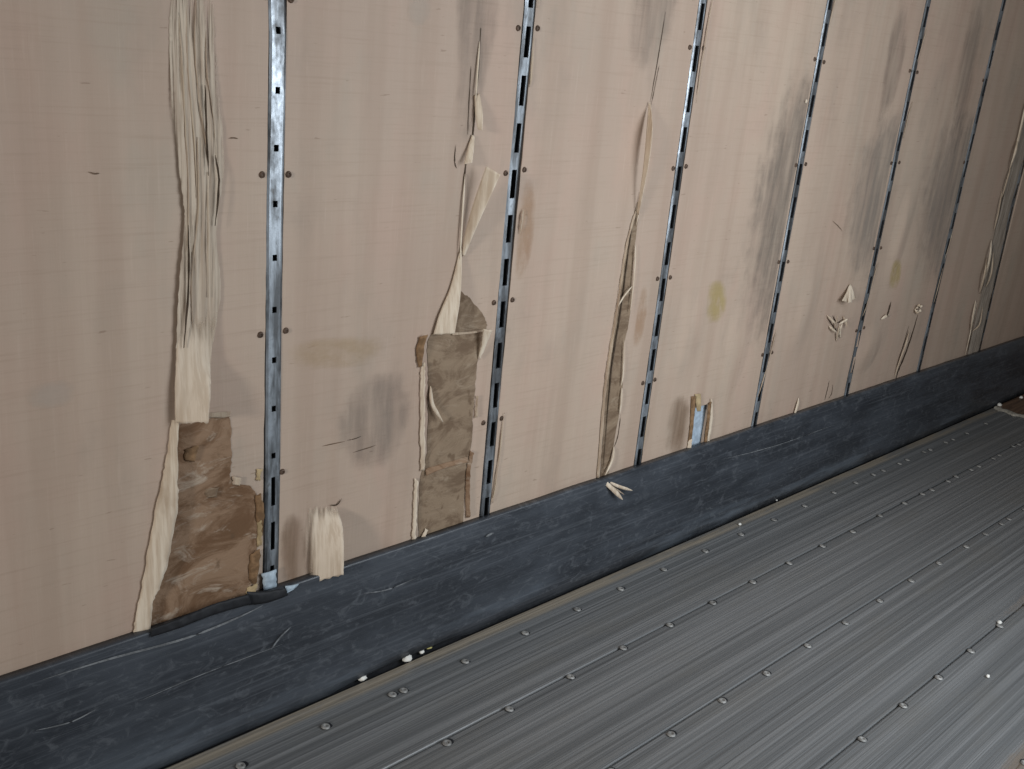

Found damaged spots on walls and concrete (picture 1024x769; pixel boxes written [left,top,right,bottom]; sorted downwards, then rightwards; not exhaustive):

peeling [464,93,483,164]
spalling [151,412,265,626]
spalling [412,291,493,540]